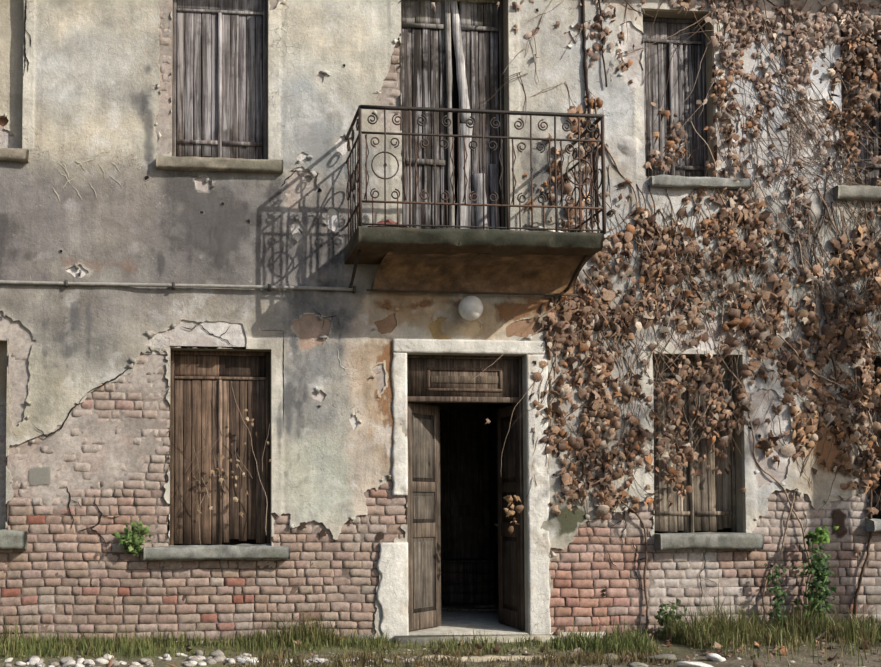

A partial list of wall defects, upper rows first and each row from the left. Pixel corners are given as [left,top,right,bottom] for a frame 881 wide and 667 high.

crack [22,0,31,80]
spalling [154,0,173,156]
spalling [269,0,287,10]
spalling [373,39,400,131]
spalling [0,113,19,148]
water stain [166,170,263,266]
spalling [285,153,323,240]
crack [180,323,234,346]
flaking render [506,317,542,341]
crack [66,486,122,550]
spalling [0,308,406,644]
spalling [549,387,881,638]